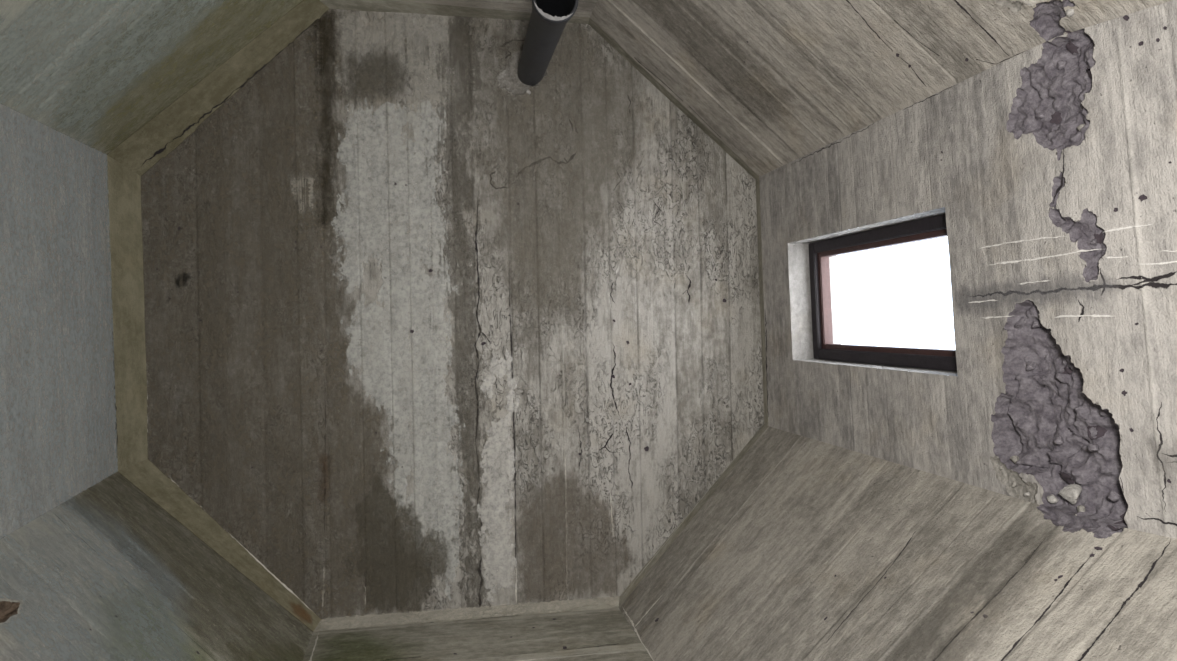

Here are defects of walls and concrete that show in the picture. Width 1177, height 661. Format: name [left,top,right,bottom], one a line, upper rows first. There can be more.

spalling [0,601,20,623]
water stain [0,0,319,661]
water stain [141,9,453,619]
spalling [996,0,1107,282]
crack [1053,153,1064,204]
spalling [990,300,1133,557]
crack [968,268,1177,322]
crack [1078,402,1177,661]